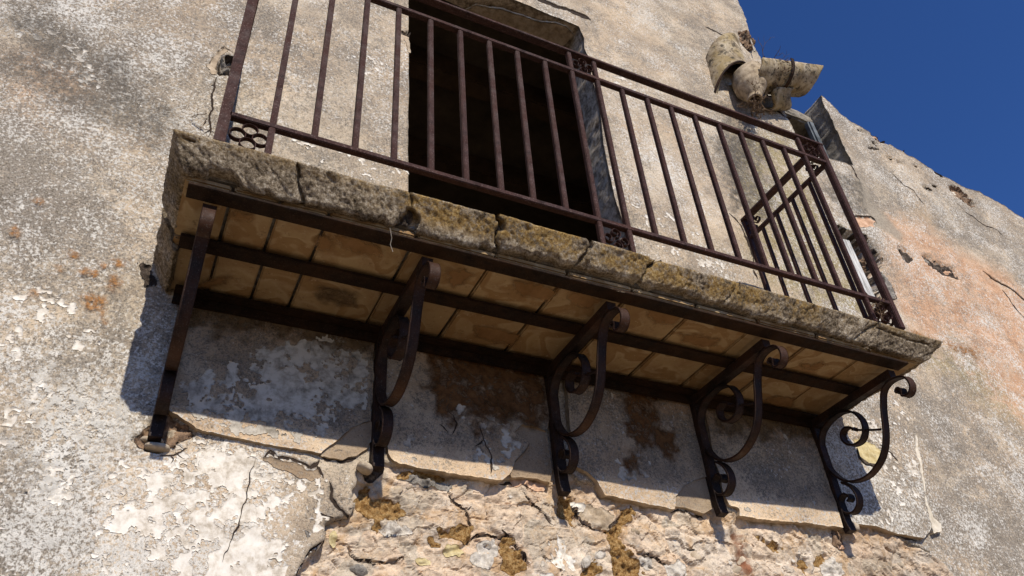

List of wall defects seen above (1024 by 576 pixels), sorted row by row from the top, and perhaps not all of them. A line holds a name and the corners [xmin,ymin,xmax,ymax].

crack [205,47,231,138]
spalling [206,46,233,76]
spalling [924,172,975,207]
peeling [12,286,78,324]
corrosion [81,259,122,324]
spalling [897,247,958,280]
crack [982,266,1024,315]
peeling [66,328,101,352]
peeling [0,377,54,446]
spalling [95,335,956,576]
crack [440,403,619,533]
crack [223,445,356,576]